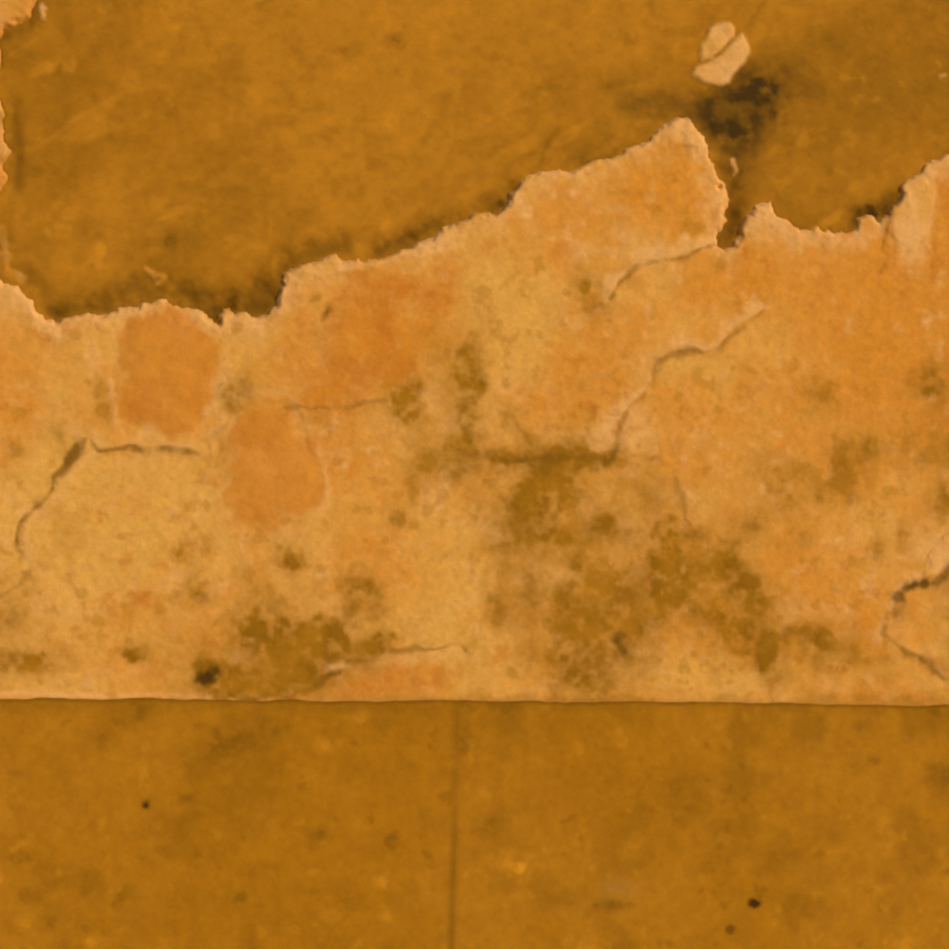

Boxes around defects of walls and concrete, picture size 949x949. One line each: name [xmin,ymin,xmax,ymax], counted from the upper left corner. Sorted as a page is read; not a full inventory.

peeling [0,0,50,64]
peeling [689,19,751,88]
peeling [0,101,12,191]
peeling [193,117,949,514]
crack [607,241,718,302]
crack [0,430,201,602]
peeling [0,221,269,700]
crack [448,308,766,531]
water stain [370,295,949,703]
peeling [638,642,784,703]
peeling [763,468,949,652]
crack [878,568,949,690]